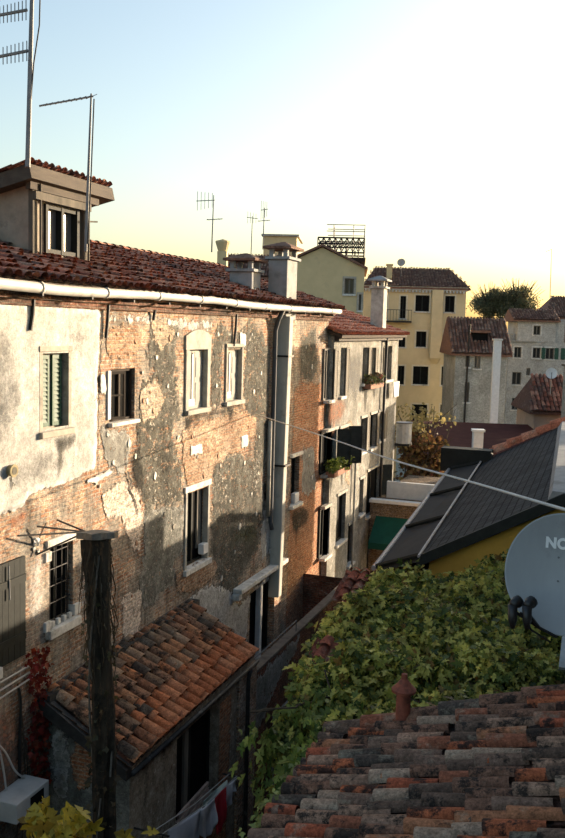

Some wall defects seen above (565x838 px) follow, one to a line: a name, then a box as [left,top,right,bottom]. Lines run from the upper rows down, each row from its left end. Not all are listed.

flaking render [95,312,271,641]
flaking render [285,329,325,634]